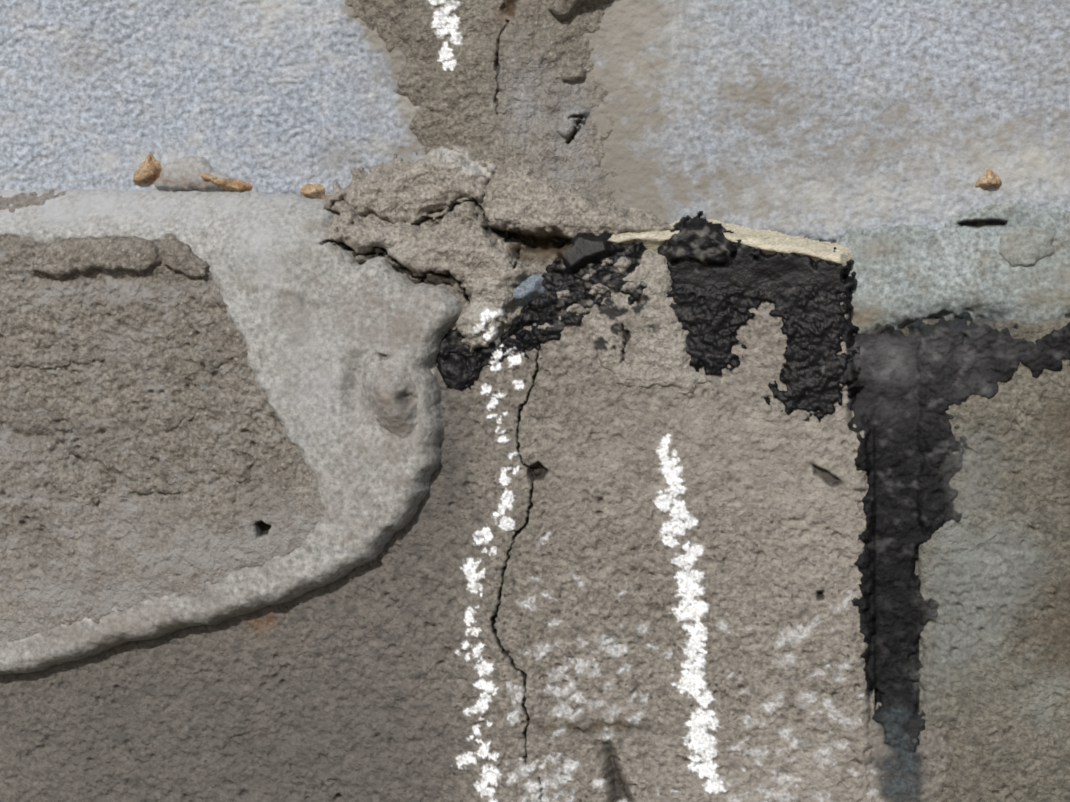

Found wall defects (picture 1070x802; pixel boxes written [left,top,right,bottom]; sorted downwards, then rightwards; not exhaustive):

spalling [0,233,326,647]
crack [492,351,544,802]
leakage [878,706,921,802]